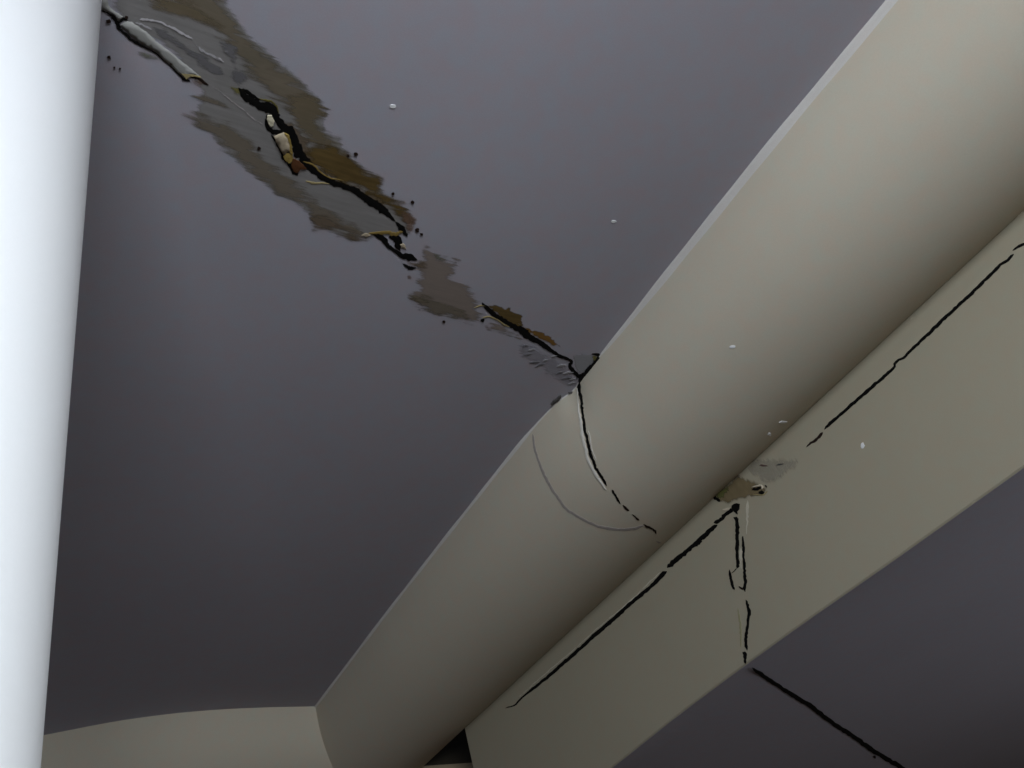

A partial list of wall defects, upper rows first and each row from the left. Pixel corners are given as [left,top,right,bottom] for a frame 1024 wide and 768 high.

peeling [101,0,226,79]
spalling [267,115,306,173]
leakage [106,0,481,323]
spalling [713,475,767,511]
crack [474,303,905,768]